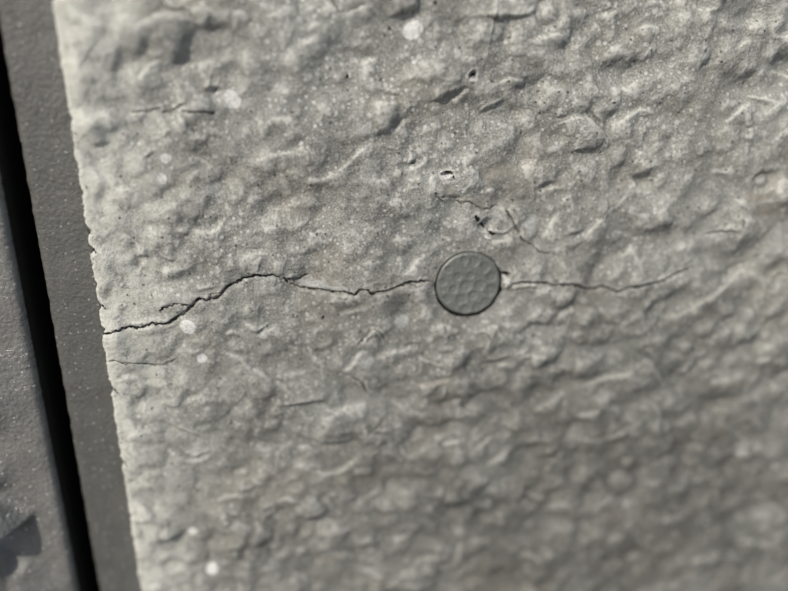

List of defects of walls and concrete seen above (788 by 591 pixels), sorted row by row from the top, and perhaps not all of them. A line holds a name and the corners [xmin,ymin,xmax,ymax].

crack [435,193,546,254]
crack [103,273,434,335]
crack [501,260,691,293]